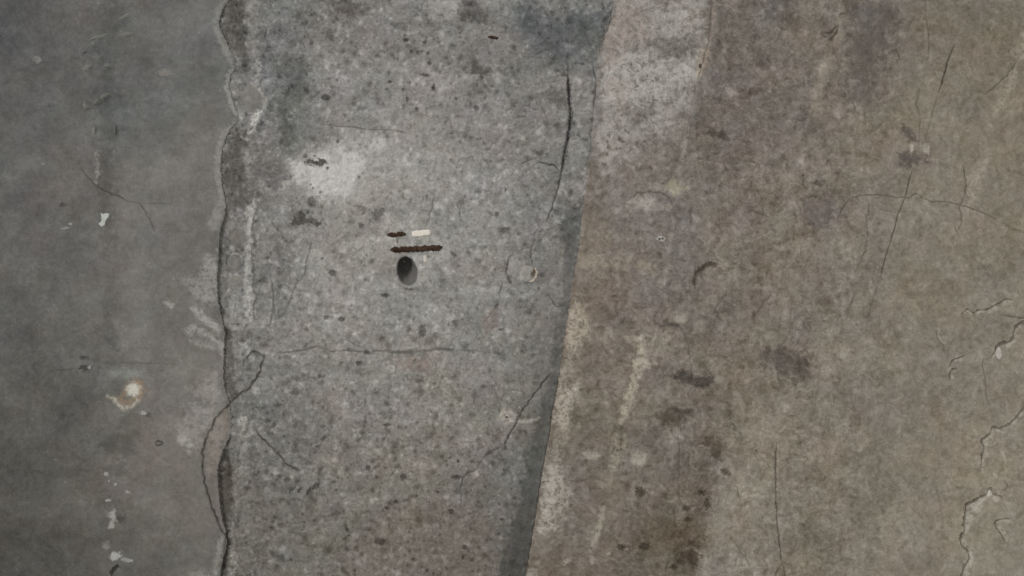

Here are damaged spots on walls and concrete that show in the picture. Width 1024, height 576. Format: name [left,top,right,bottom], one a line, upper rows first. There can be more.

crack [486,6,613,319]
crack [891,0,956,145]
crack [837,164,1024,326]
damp [86,299,156,565]
crack [200,339,507,554]
crack [459,373,560,576]